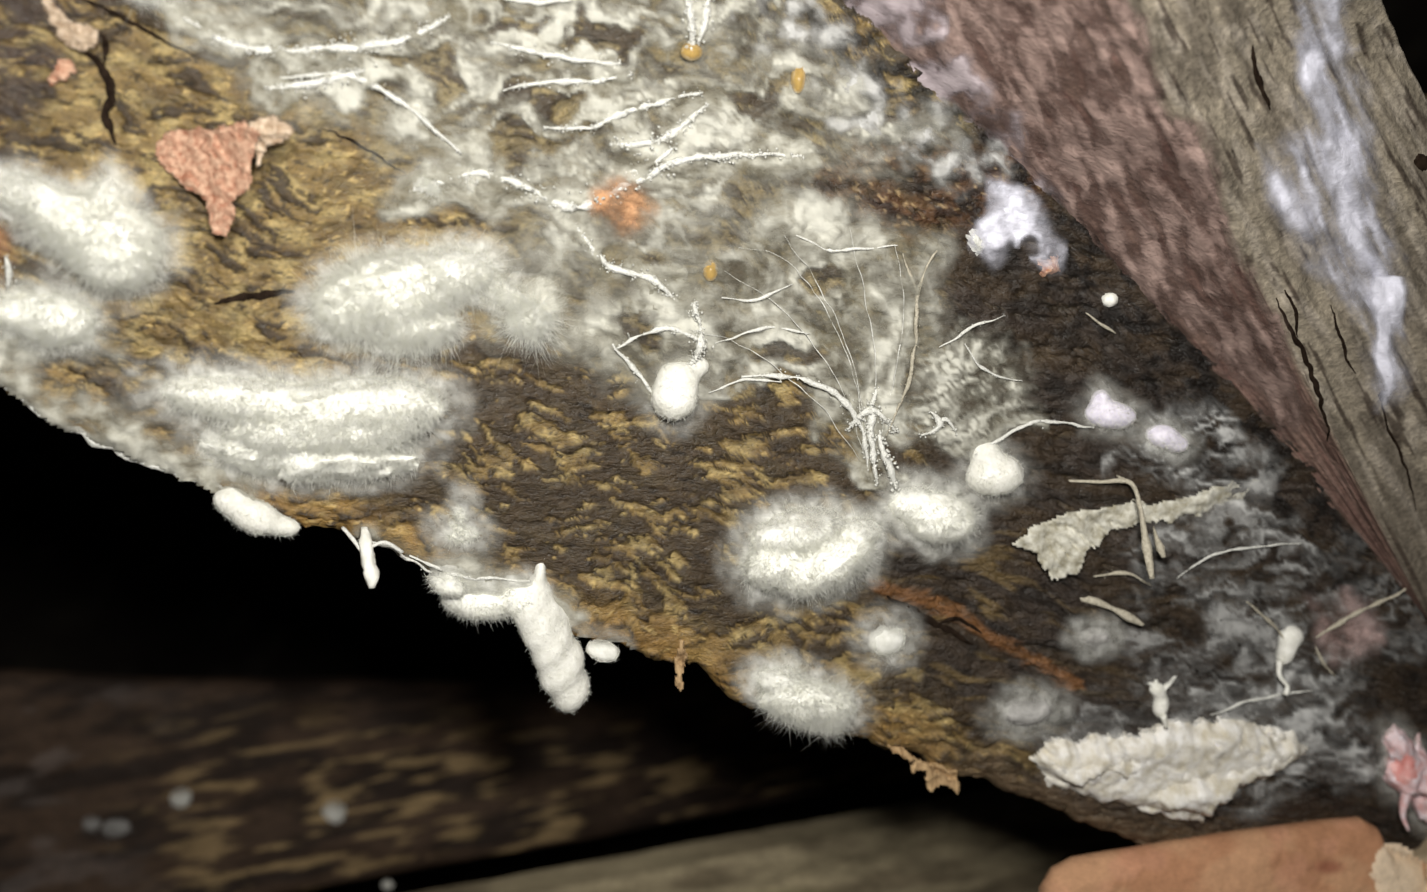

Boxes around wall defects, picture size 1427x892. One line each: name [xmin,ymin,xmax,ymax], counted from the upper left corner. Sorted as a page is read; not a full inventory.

crack [82,0,200,144]
peeling [156,114,294,237]
damp [0,0,1315,614]
damp [1268,0,1405,400]
crack [1276,290,1417,511]
damp [357,500,620,715]
damp [739,654,869,750]
damp [866,622,911,669]
damp [1002,582,1427,831]